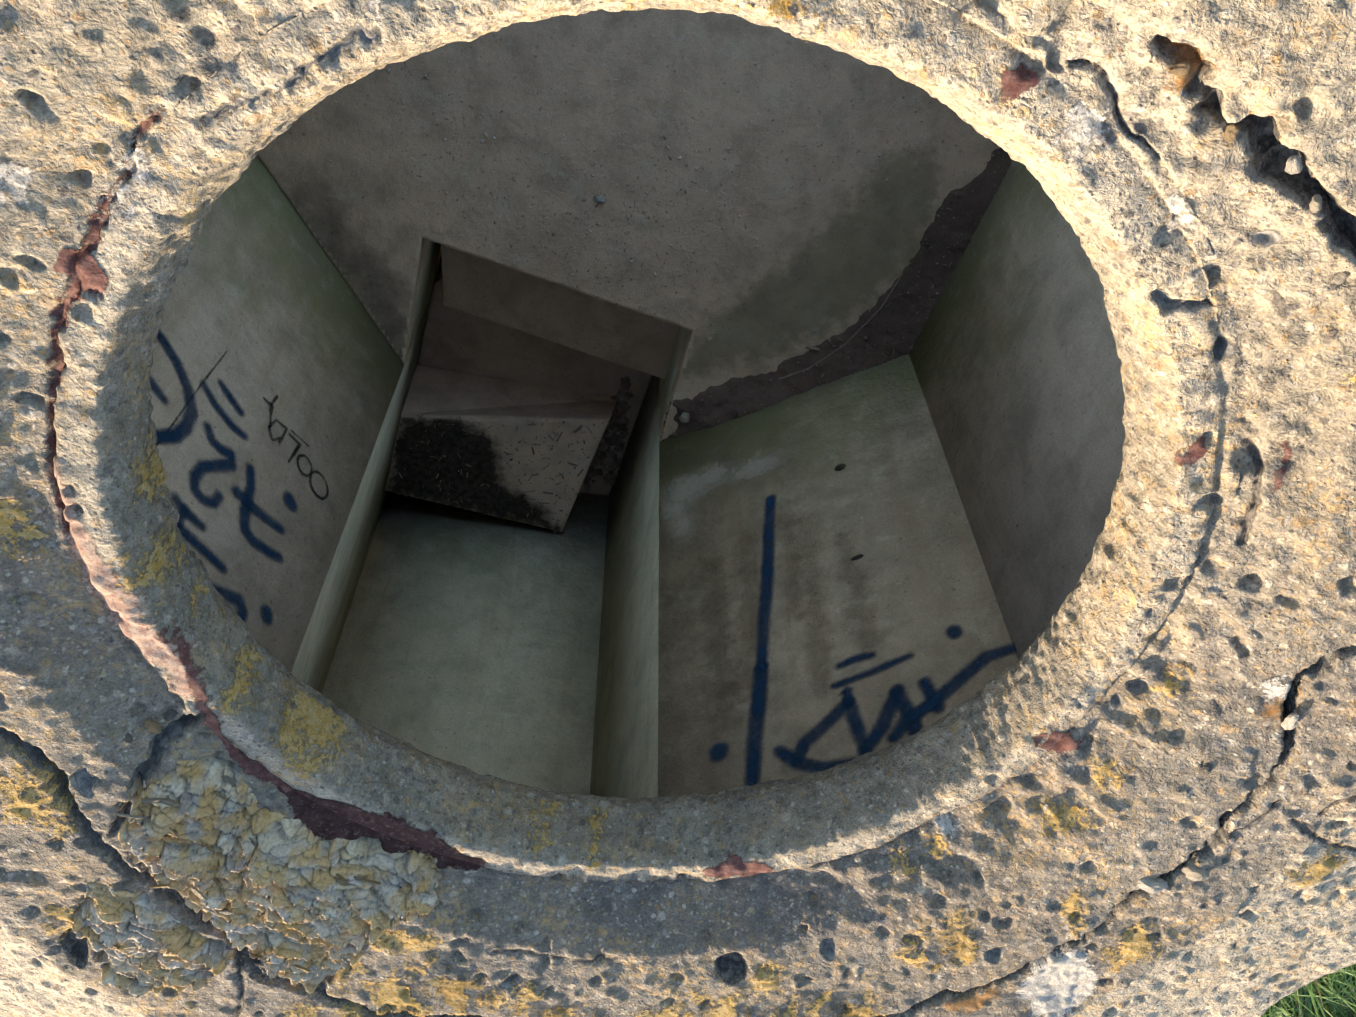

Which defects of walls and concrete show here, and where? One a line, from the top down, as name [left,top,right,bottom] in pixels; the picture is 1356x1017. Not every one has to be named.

crack [1067,59,1151,148]
crack [1155,34,1356,285]
crack [156,351,227,446]
crack [124,702,211,744]
crack [0,727,212,925]
crack [1023,645,1356,968]
spalling [69,751,443,998]
crack [234,946,367,1017]
crack [876,984,987,1017]